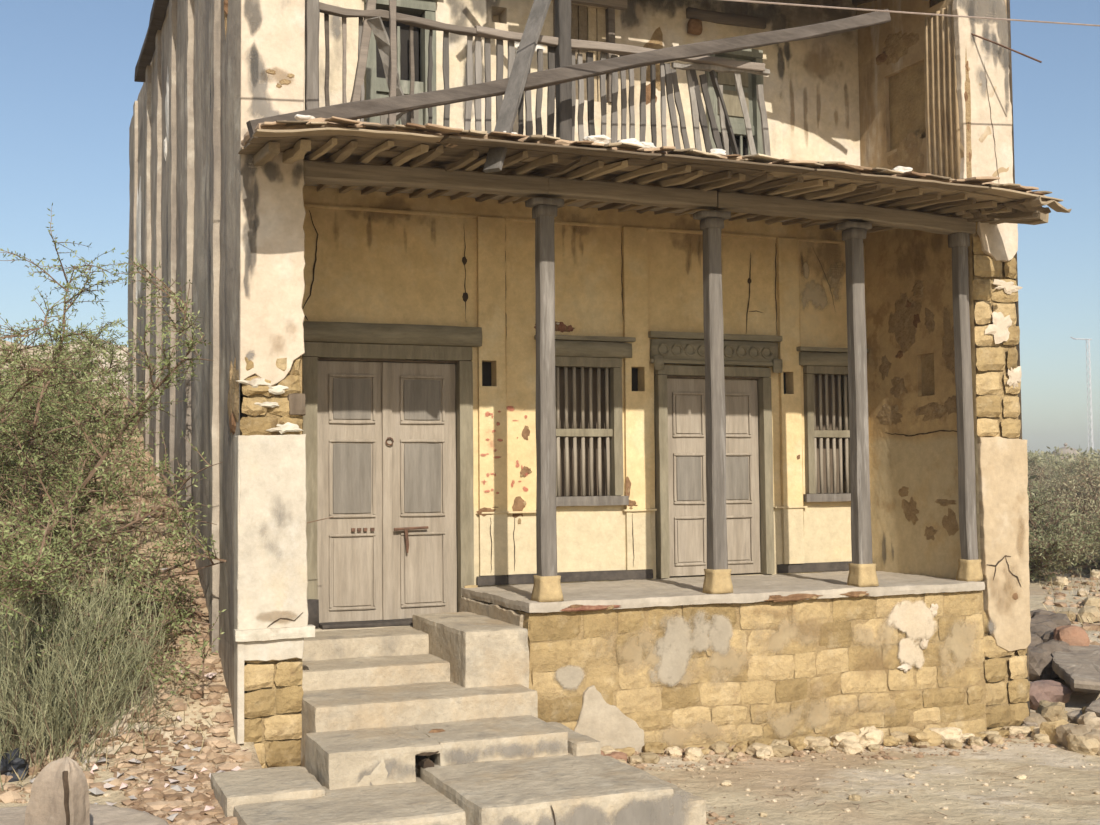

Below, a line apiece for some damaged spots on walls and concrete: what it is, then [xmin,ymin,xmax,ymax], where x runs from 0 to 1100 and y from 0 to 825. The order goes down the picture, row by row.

flaking render [227,357,303,436]
crack [302,211,318,320]
crack [461,231,469,319]
flaking render [555,321,575,333]
crack [746,243,777,332]
flaking render [876,279,957,426]
flaking render [973,222,1023,438]
flaking render [512,496,526,524]
crack [986,555,1021,600]